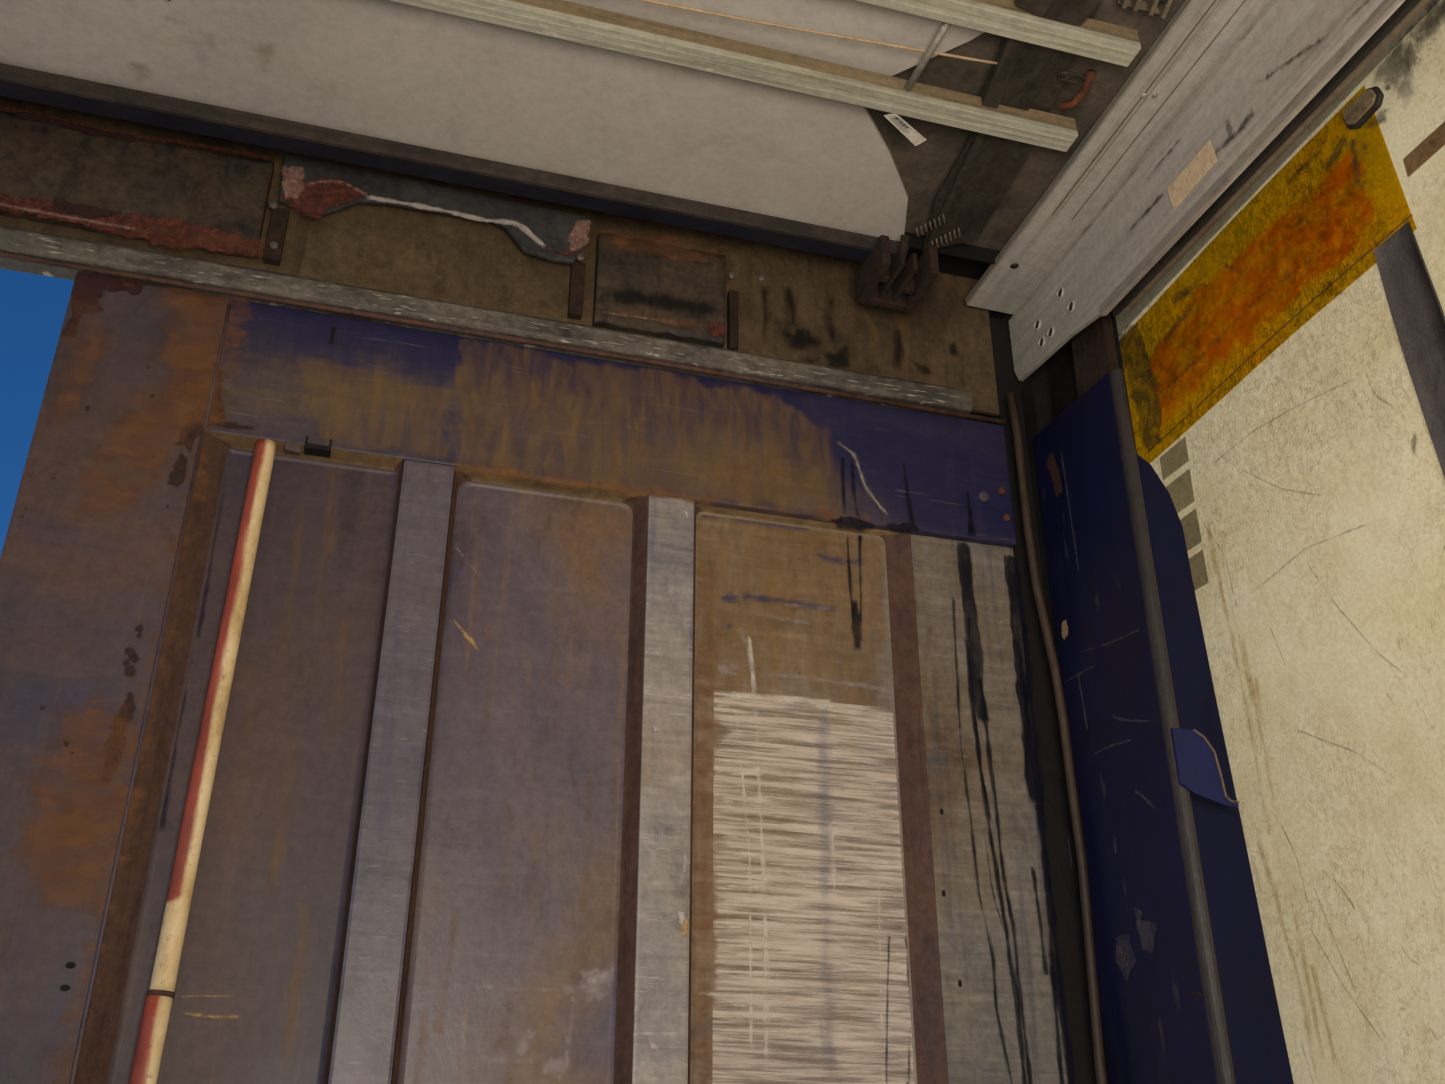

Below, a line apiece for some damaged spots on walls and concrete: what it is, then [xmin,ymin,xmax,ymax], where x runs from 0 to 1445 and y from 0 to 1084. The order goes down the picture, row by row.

corrosion [0,193,264,258]
corrosion [282,166,591,255]
corrosion [101,625,143,783]